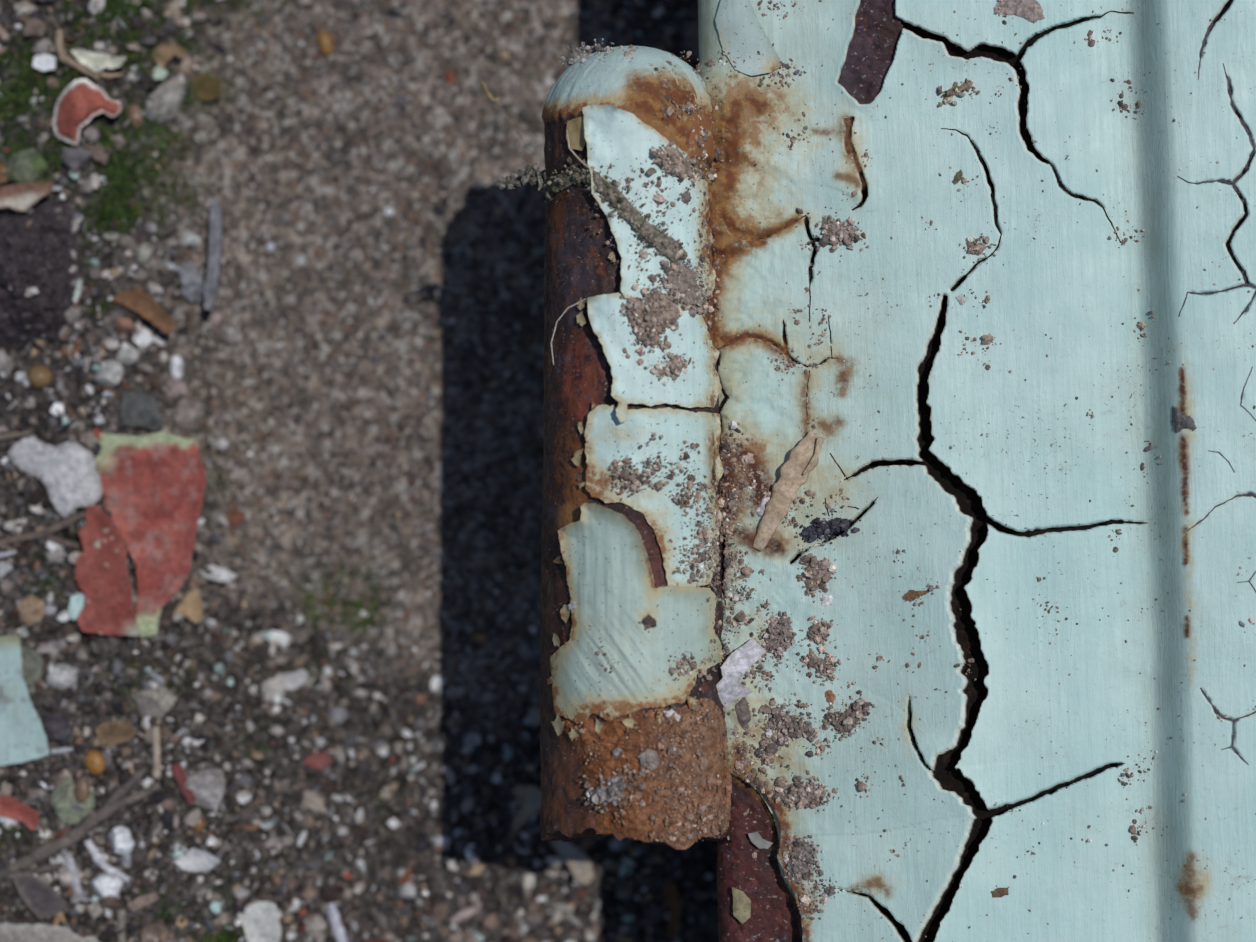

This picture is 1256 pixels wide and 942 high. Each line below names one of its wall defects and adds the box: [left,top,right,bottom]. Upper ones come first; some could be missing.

corrosion [626,72,801,359]
crack [708,118,836,426]
peeling [838,0,903,153]
crack [899,11,1134,243]
crack [1177,0,1256,324]
peeling [547,104,724,741]
corrosion [712,436,786,555]
crack [790,128,1148,942]
corrosion [1180,436,1189,565]
corrosion [560,698,811,942]
peeling [735,697,751,730]
crack [1200,688,1256,765]